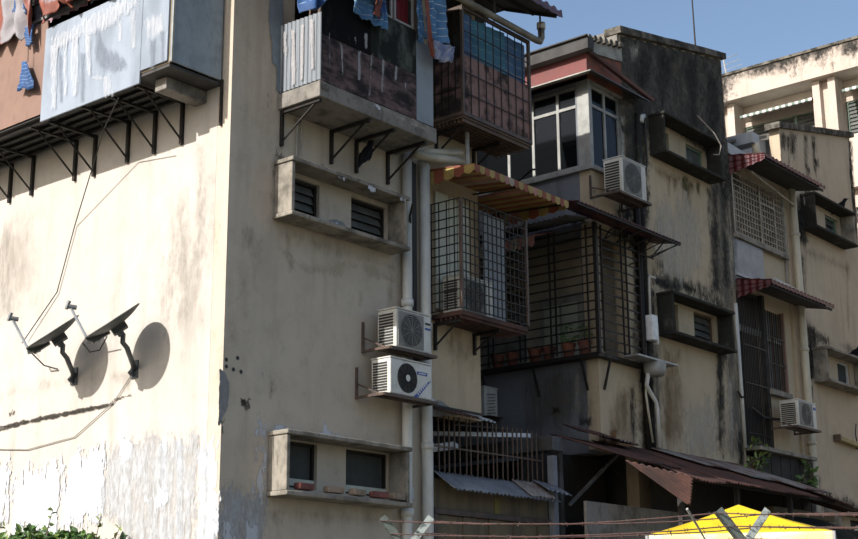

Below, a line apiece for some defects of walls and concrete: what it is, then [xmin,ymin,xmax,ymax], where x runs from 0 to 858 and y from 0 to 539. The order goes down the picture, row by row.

water stain [686,40,858,138]
water stain [849,141,858,238]
water stain [651,177,732,315]
water stain [797,191,808,289]
water stain [807,328,815,402]
peeling [0,369,293,539]